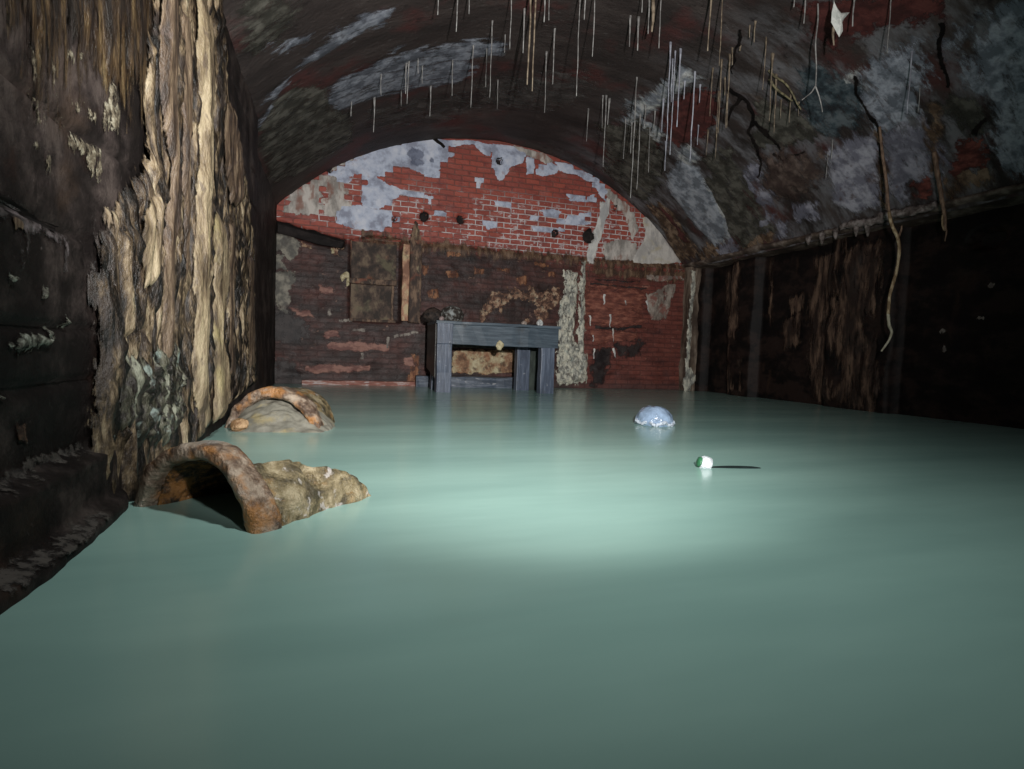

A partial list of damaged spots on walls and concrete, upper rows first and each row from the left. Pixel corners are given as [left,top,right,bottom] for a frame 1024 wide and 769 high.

damp [258,8,394,128]
damp [367,71,591,126]
damp [621,66,705,143]
crack [727,29,805,178]
damp [794,61,866,138]
crack [853,76,881,153]
crack [936,22,950,88]
damp [407,148,434,166]
peeling [275,87,824,350]
damp [805,201,938,245]
damp [361,197,696,391]
peeling [305,330,389,374]